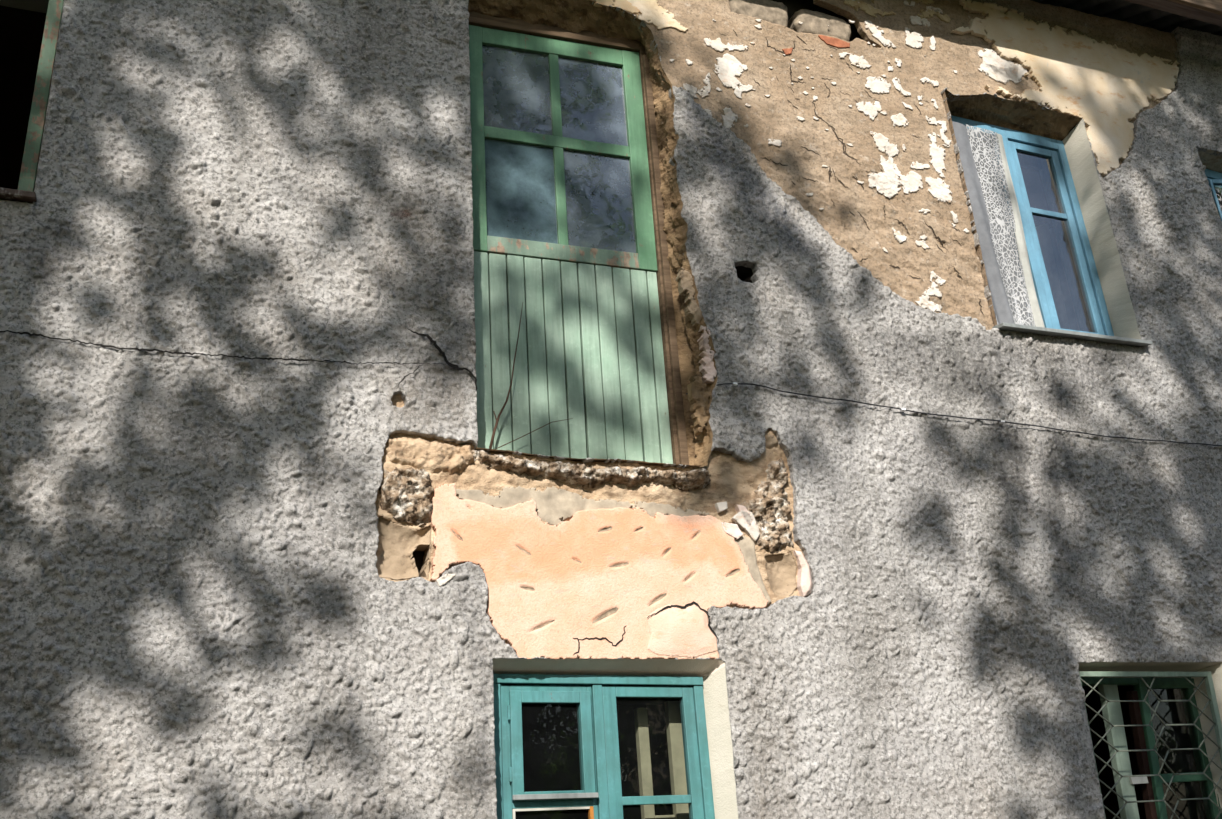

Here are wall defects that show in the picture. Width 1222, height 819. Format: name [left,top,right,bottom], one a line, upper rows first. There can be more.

peeling [589,0,1180,330]
crack [0,328,477,390]
spalling [391,394,404,408]
spalling [375,429,813,660]